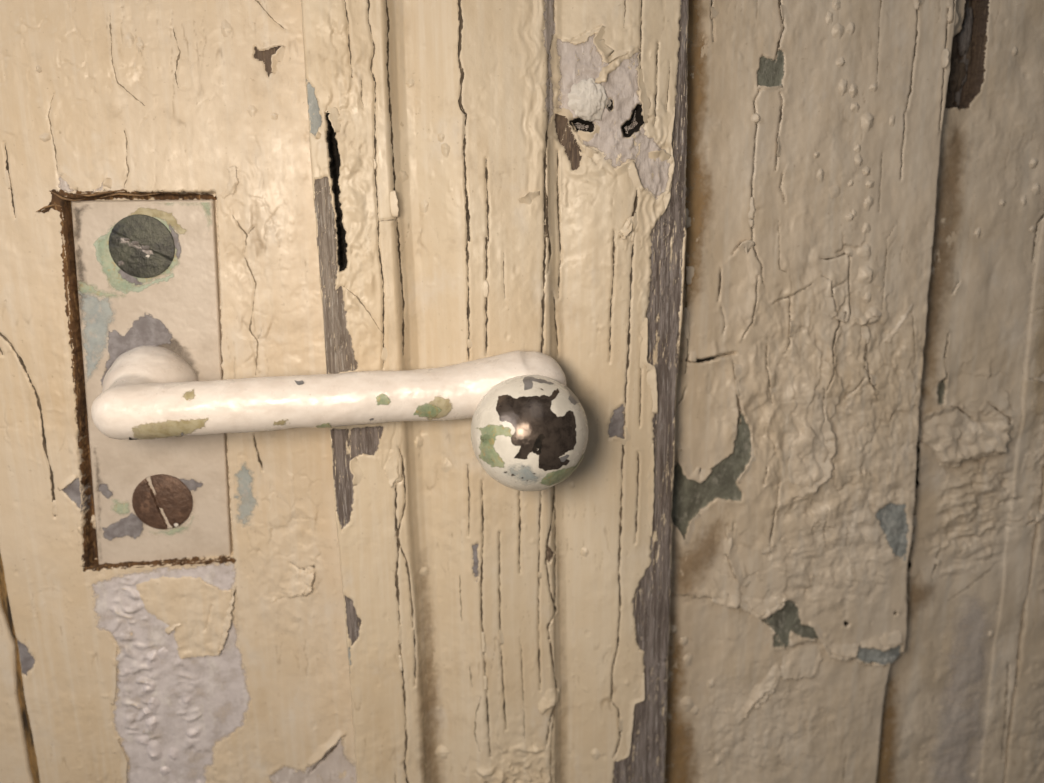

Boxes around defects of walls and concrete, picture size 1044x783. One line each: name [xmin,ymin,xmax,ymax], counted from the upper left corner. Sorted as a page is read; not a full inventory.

peeling [314,176,358,374]
crack [458,0,505,361]
crack [541,0,561,353]
crack [676,91,877,424]
crack [0,553,40,783]
crack [0,333,57,516]
peeling [92,563,251,783]
peeling [268,730,357,783]
peeling [330,426,383,529]
crack [459,467,557,783]
peeling [543,0,756,783]
peeling [711,531,826,648]